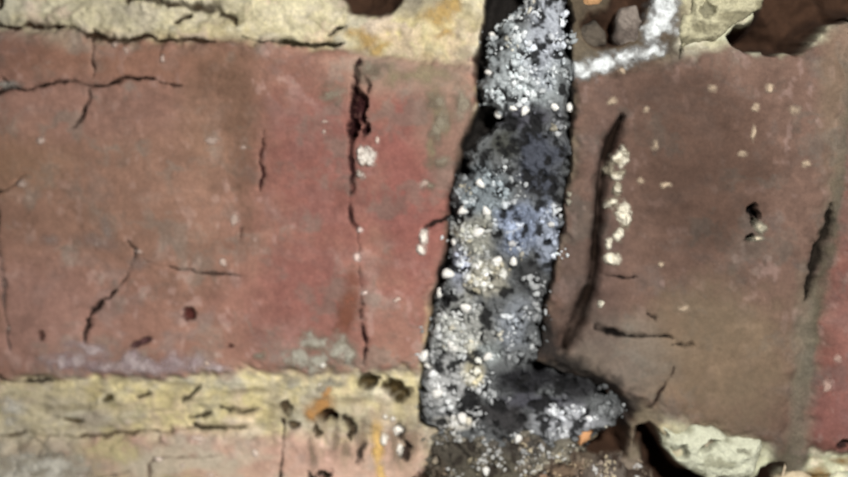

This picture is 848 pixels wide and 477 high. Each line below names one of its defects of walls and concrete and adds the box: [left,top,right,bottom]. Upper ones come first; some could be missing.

crack [0,80,69,94]
crack [0,0,343,87]
crack [258,142,266,191]
crack [349,58,371,223]
crack [453,0,524,186]
crack [561,2,572,59]
crack [566,80,576,137]
crack [83,243,137,342]
crack [359,310,367,358]
crack [425,207,458,346]
crack [531,164,568,382]
crack [562,116,681,349]